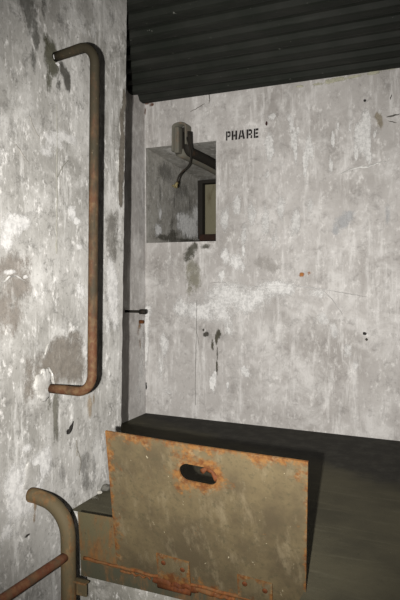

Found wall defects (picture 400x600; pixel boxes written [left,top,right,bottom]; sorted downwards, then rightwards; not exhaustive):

damp [25,330,85,397]
damp [173,281,295,372]